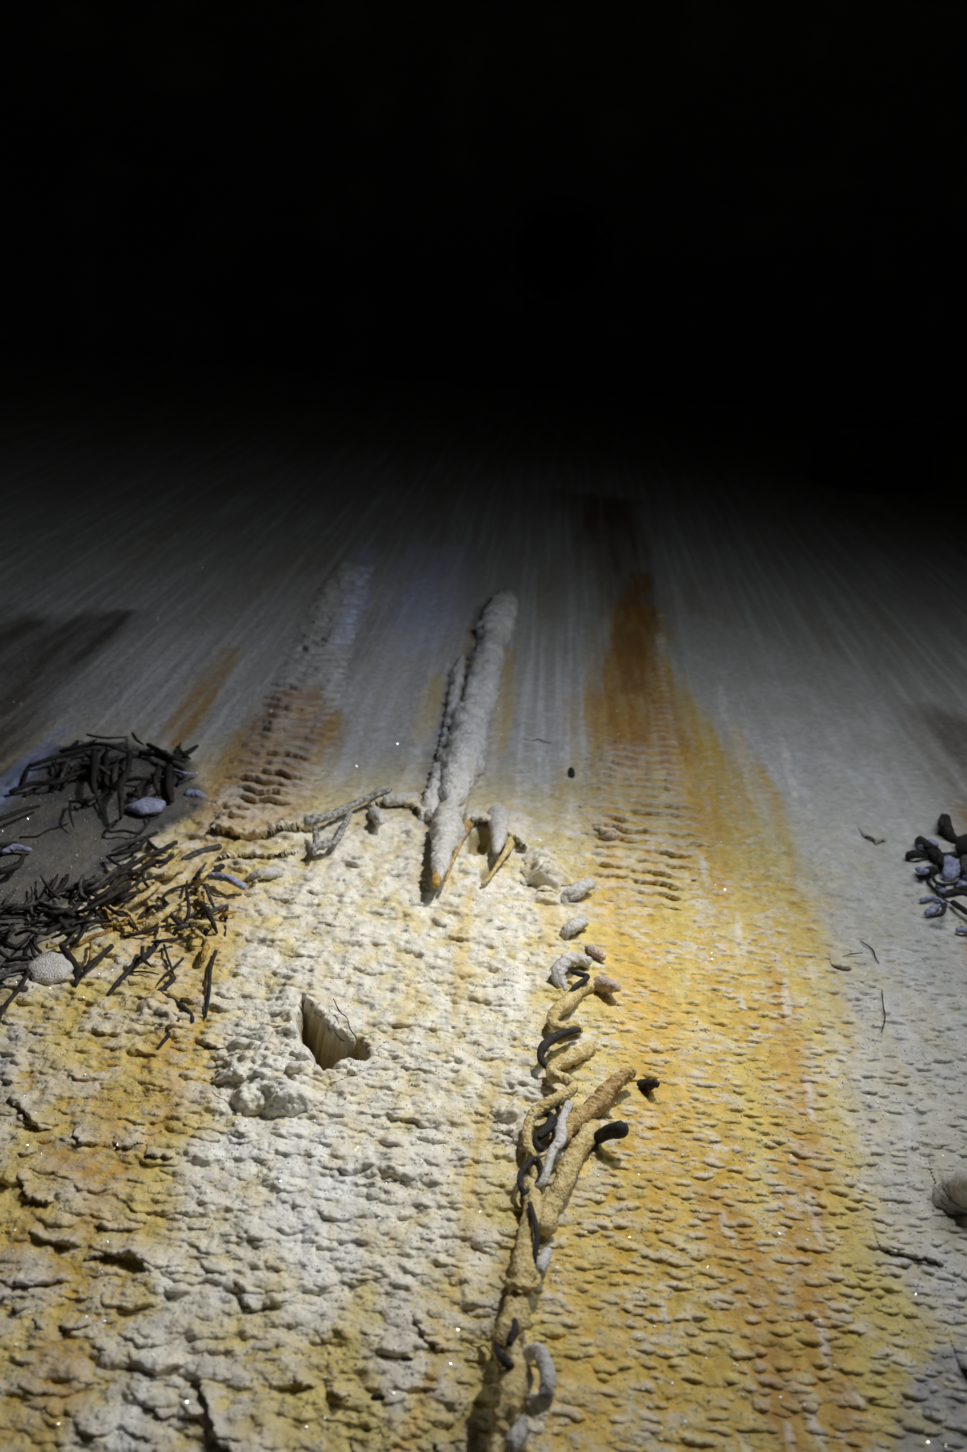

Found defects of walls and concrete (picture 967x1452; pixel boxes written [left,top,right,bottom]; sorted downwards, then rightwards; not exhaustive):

corrosion [156,646,247,750]
corrosion [407,625,478,746]
corrosion [489,647,519,758]
corrosion [943,797,967,837]
corrosion [0,689,302,1452]
efflorescence [65,539,578,1452]
corrosion [393,948,422,1033]
corrosion [445,884,477,1026]
corrosion [517,570,910,1452]
corrosion [388,1061,517,1452]